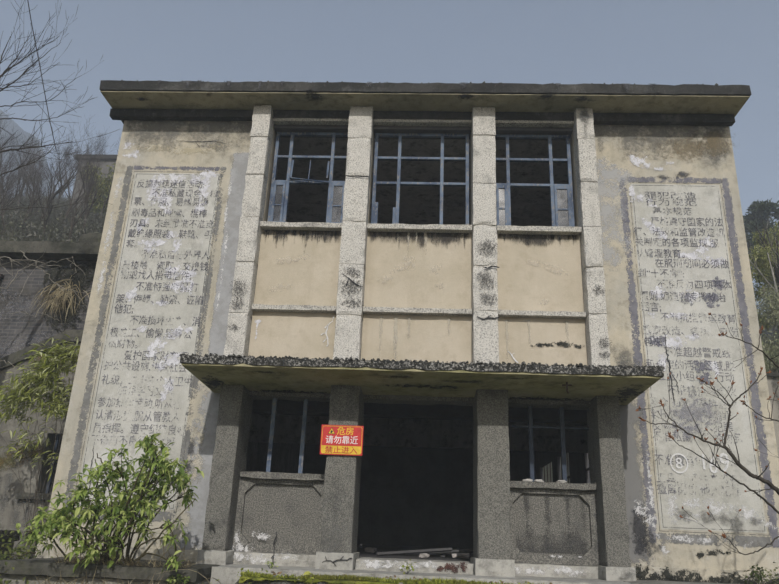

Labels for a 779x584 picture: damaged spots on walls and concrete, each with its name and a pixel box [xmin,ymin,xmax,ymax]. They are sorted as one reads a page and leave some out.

peeling [627,155,674,171]
peeling [146,169,218,215]
leakage [263,230,340,243]
leakage [370,232,469,248]
leakage [498,234,578,246]
leakage [527,320,585,349]
peeling [146,325,194,401]
leakage [634,453,731,559]
leakage [665,493,779,536]
leakage [627,564,779,584]